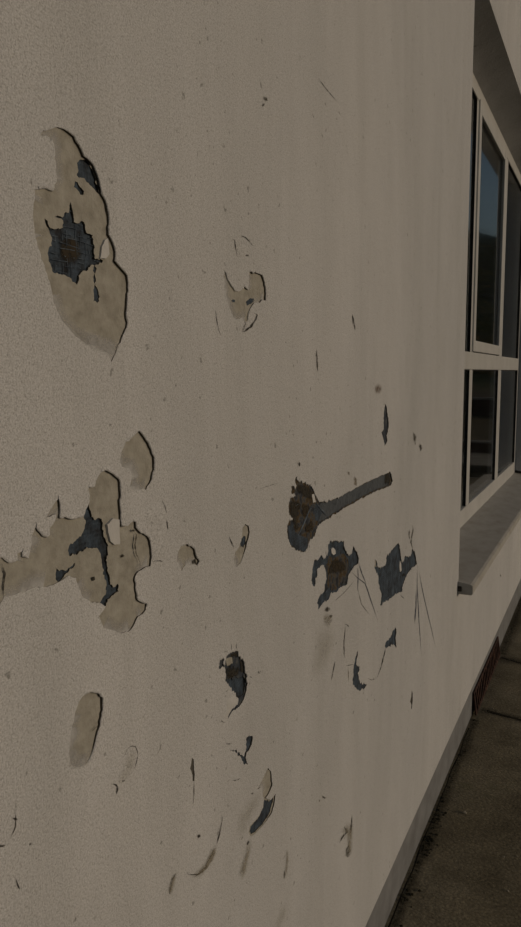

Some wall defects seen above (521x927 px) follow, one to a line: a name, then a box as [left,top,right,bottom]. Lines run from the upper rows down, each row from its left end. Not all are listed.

peeling [33,126,130,362]
peeling [224,269,267,332]
peeling [0,428,157,633]
peeling [177,540,201,571]
peeling [311,538,359,622]
peeling [287,462,393,552]
peeling [374,531,417,605]
peeling [219,644,252,721]
peeling [348,628,396,691]
peeling [69,688,105,767]
peeling [242,768,276,873]